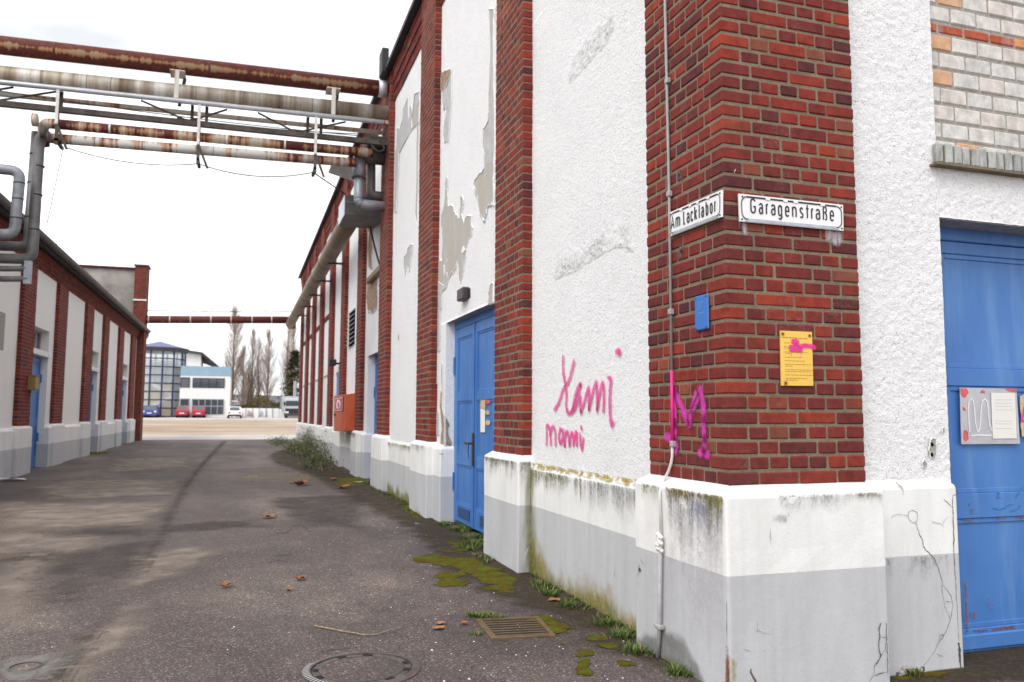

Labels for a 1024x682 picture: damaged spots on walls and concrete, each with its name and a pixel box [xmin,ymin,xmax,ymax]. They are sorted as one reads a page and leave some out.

peeling [394,90,421,225]
peeling [436,7,496,446]
damp [633,484,722,515]
crack [891,482,962,668]
crack [874,623,888,676]